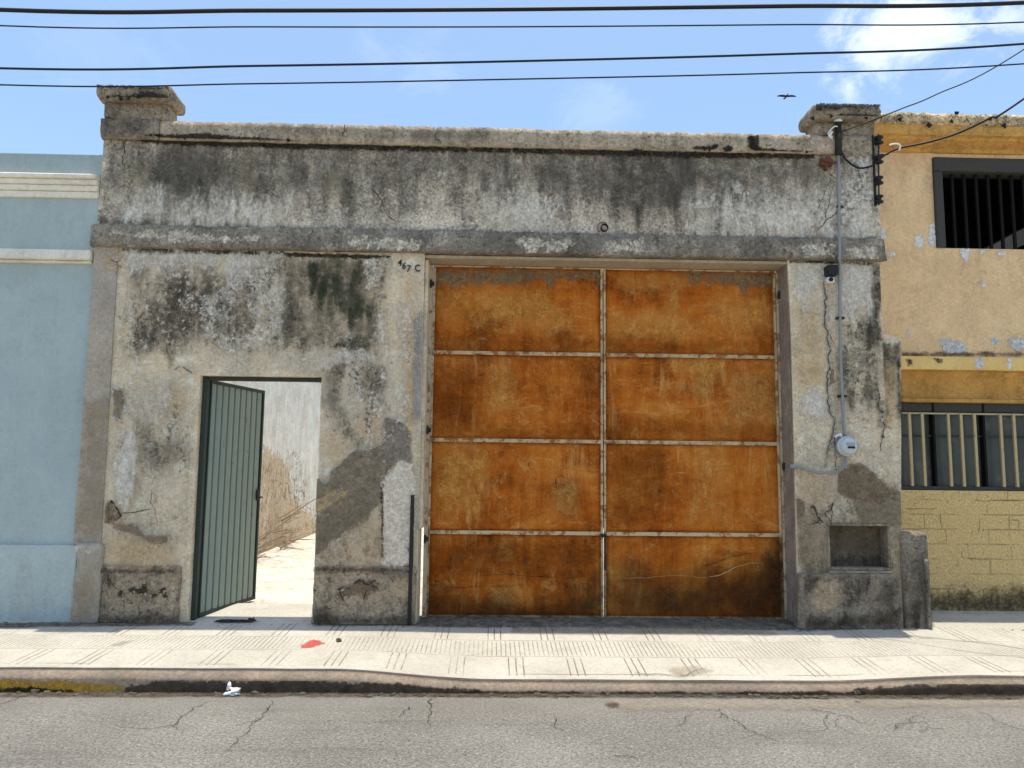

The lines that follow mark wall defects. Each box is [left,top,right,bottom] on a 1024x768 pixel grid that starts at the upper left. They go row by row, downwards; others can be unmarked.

crack [817,179,837,231]
peeling [914,223,936,248]
peeling [960,248,1006,262]
water stain [102,140,816,458]
crack [822,281,837,477]
crack [878,389,892,453]
flaking render [258,419,410,558]
water stain [316,499,379,568]
crack [811,502,834,524]
water stain [797,463,902,526]
spalling [118,582,170,601]
spalling [336,580,379,602]